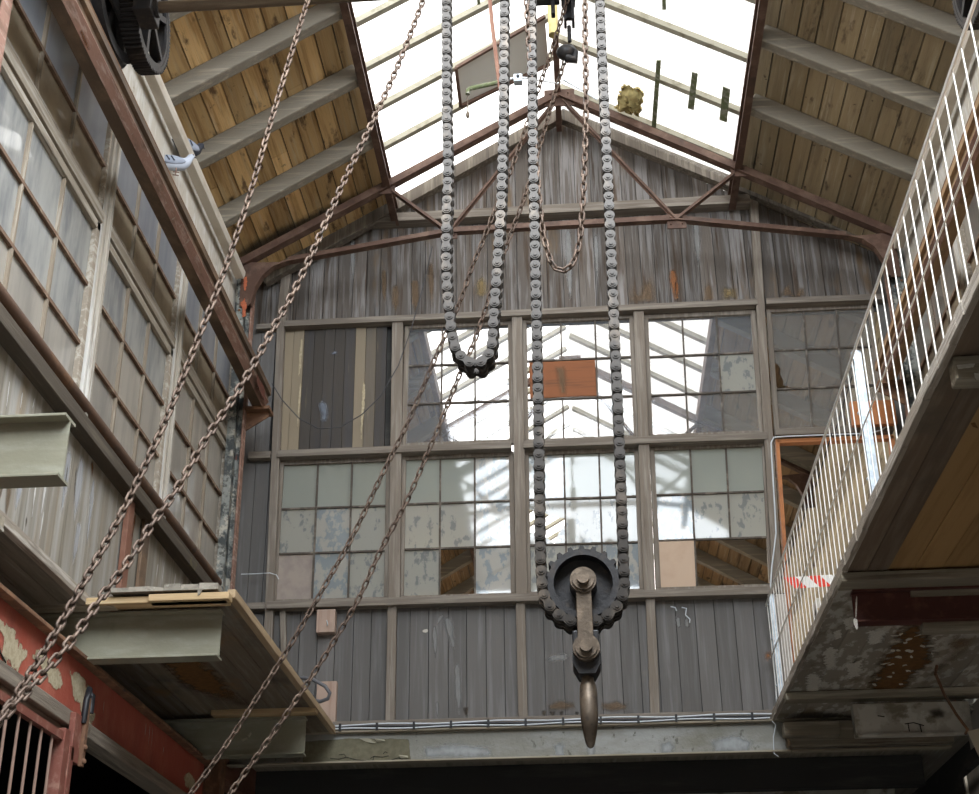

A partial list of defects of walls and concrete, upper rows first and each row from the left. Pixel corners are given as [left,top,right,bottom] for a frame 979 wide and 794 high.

peeling [0,619,95,725]
peeling [805,616,864,691]
peeling [865,629,937,686]